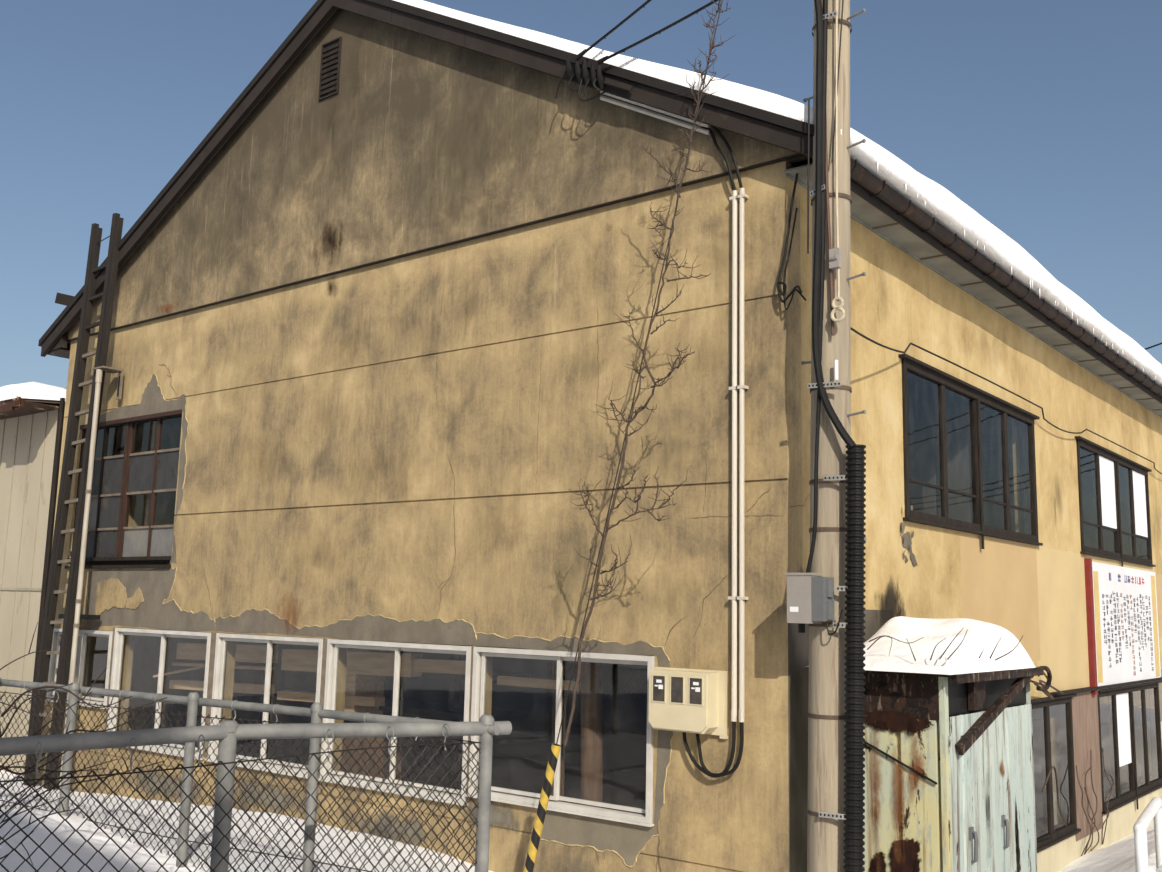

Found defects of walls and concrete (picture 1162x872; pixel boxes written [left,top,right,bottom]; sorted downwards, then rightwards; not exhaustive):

flaking render [87,372,670,668]
flaking render [540,730,674,868]